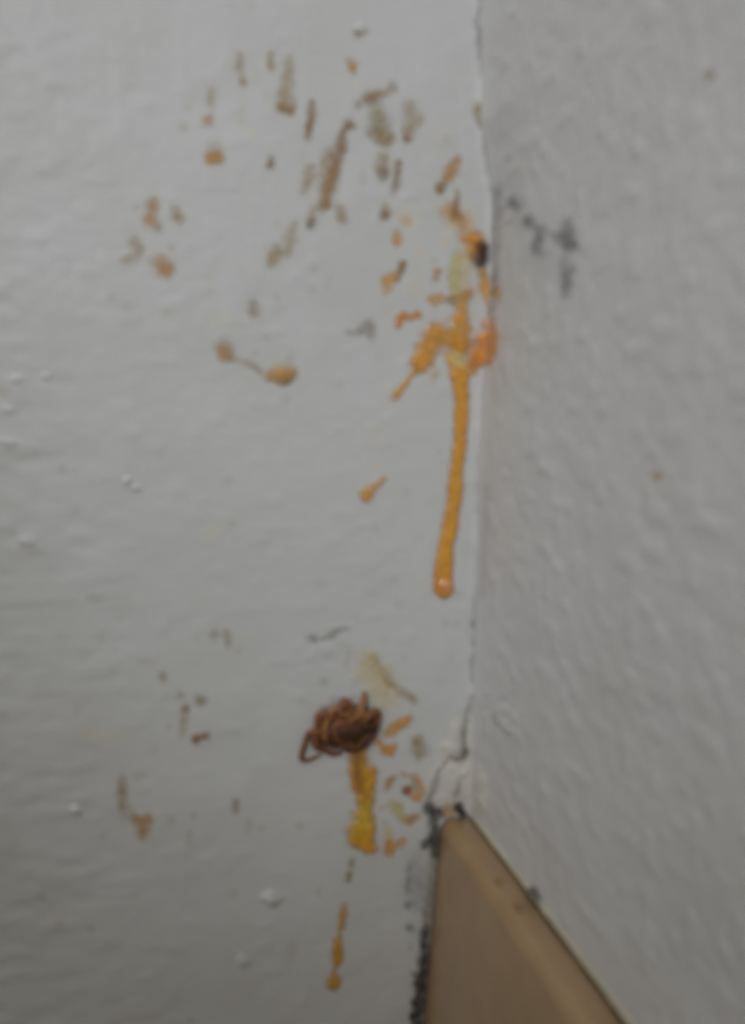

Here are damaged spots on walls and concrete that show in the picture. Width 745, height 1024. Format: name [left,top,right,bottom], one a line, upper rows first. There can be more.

crack [453,709,469,761]